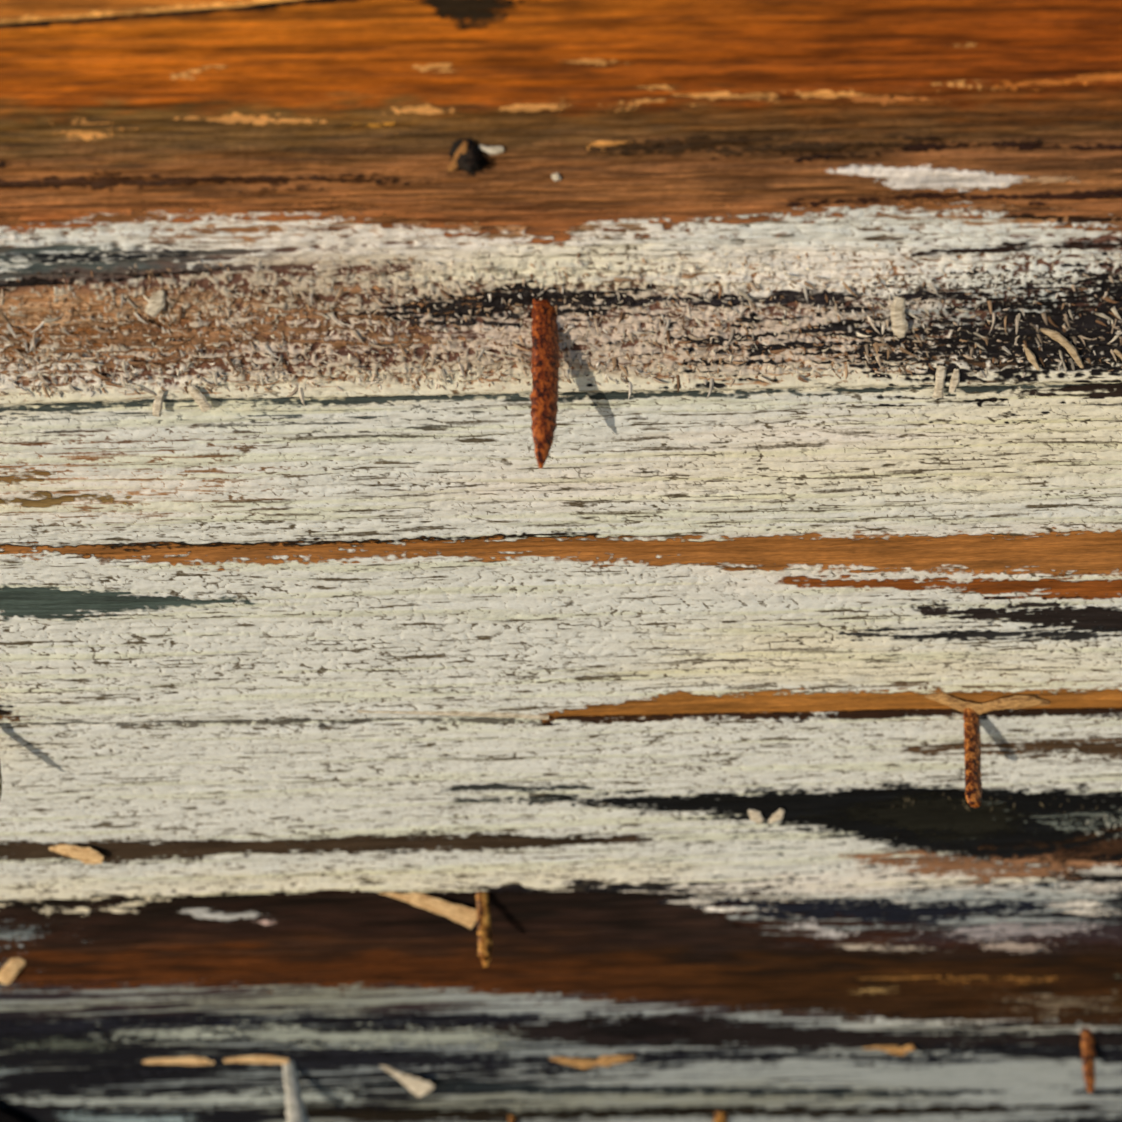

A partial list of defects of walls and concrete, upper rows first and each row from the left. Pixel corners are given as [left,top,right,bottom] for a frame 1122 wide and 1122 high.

peeling [0,0,1122,247]
peeling [0,252,1122,424]
peeling [0,527,1122,642]
peeling [539,688,1122,726]
peeling [0,779,1122,1028]
peeling [14,1020,536,1052]
peeling [1,1088,286,1122]
peeling [301,1086,365,1105]